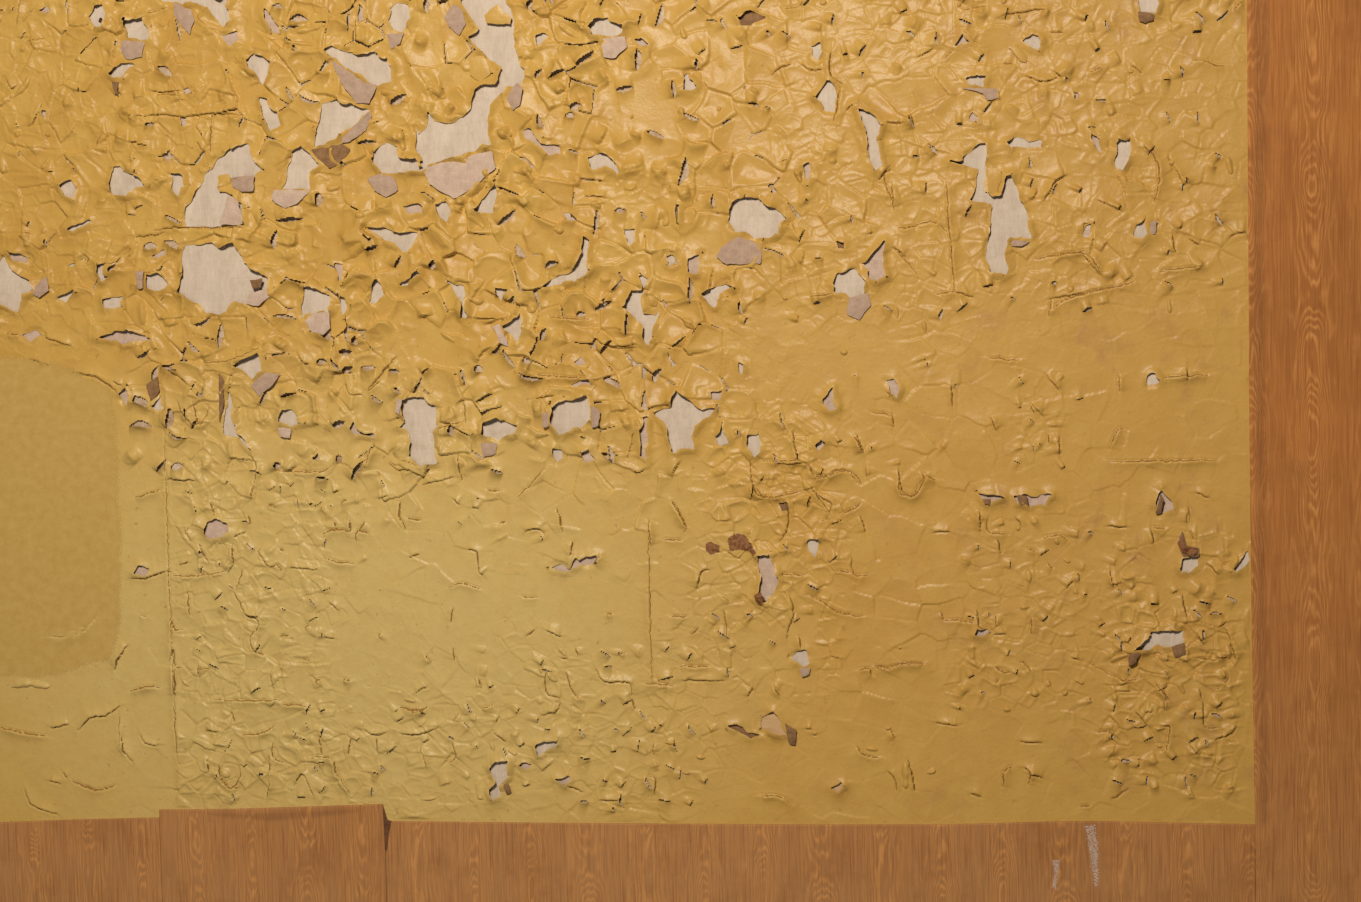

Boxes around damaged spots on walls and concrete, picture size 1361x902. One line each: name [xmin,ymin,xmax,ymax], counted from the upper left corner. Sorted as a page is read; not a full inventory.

crack [7,333,120,391]
peeling [0,0,553,351]
peeling [393,394,444,471]
crack [549,316,637,349]
peeling [635,348,764,460]
peeling [661,190,791,312]
crack [750,392,933,576]
peeling [827,236,892,320]
peeling [950,133,1049,281]
crack [0,402,599,814]
crack [523,502,780,714]
crack [1073,595,1237,753]